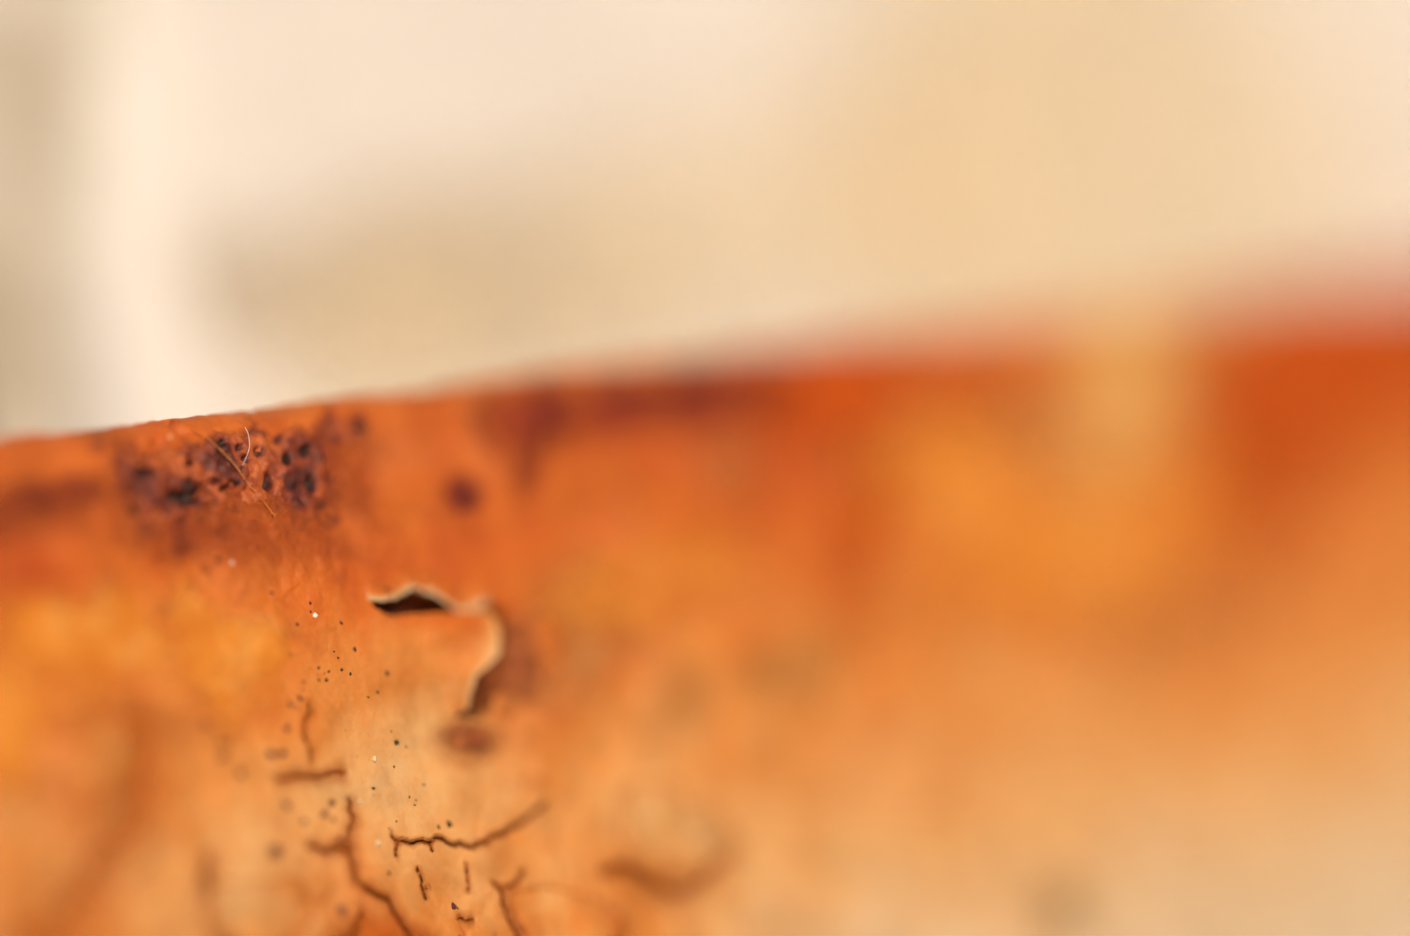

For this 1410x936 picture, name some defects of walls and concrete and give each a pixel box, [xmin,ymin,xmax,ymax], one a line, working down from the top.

rust [0,407,368,546]
rust [447,475,480,510]
rust [488,354,912,488]
rust [1194,280,1410,536]
rust [279,647,357,732]
peeling [366,571,502,713]
rust [449,726,492,750]
rust [471,626,539,699]
crack [273,699,549,936]